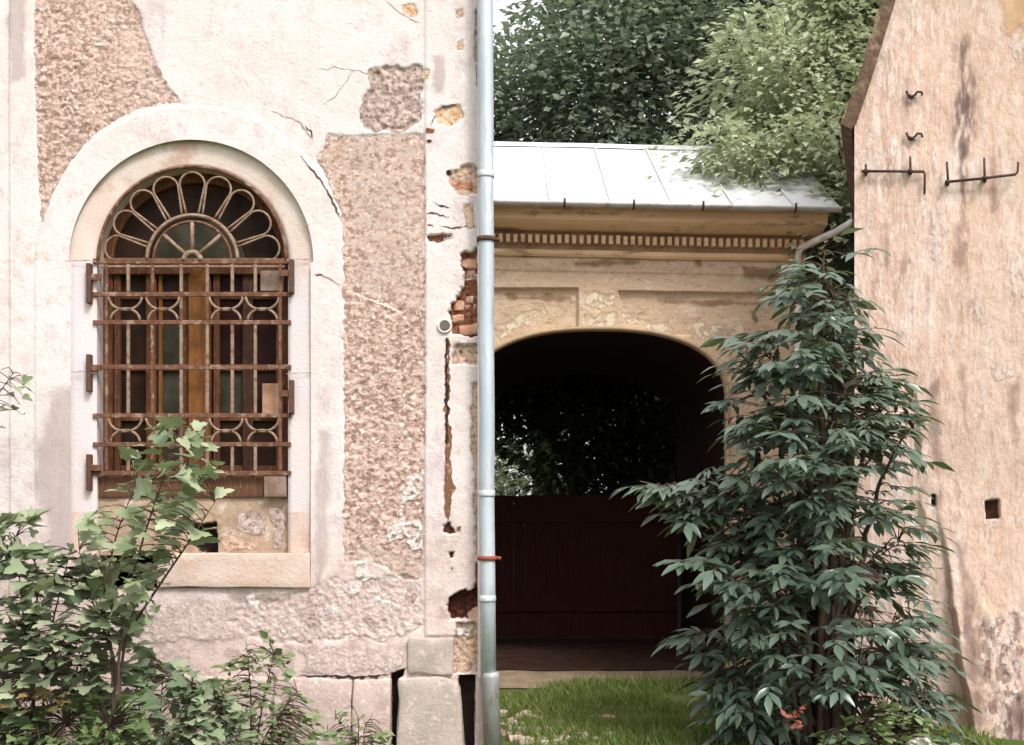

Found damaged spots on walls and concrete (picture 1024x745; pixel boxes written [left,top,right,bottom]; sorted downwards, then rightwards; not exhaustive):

crack [315,66,367,101]
spalling [359,65,464,142]
crack [272,111,341,219]
flaking render [446,165,477,228]
flaking render [449,248,478,365]
crack [443,338,456,521]